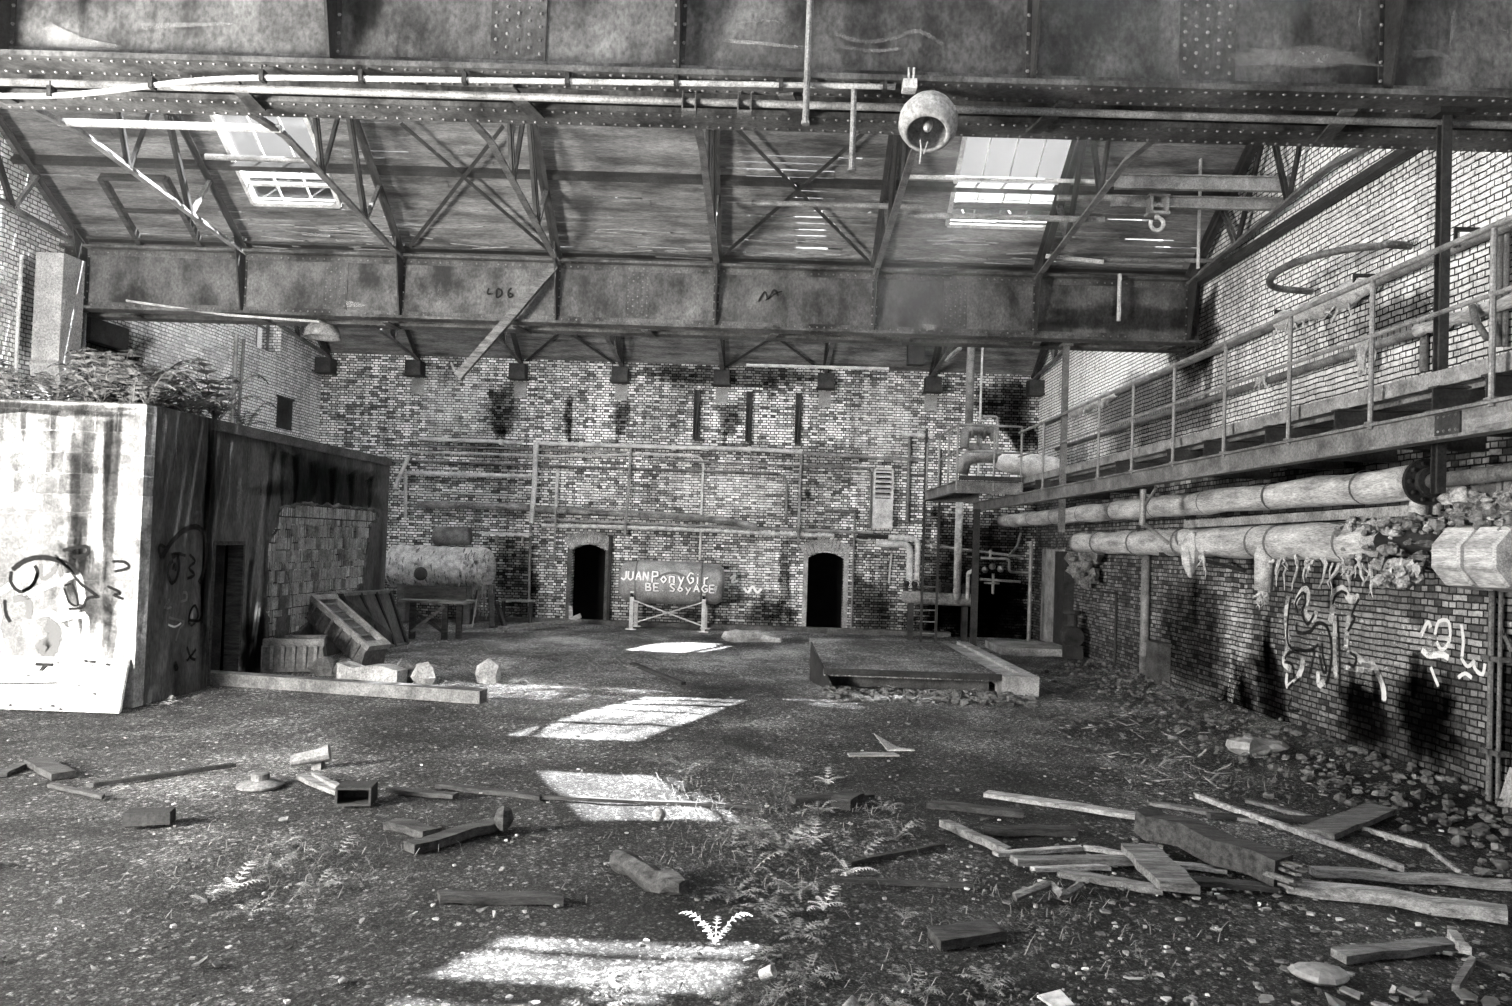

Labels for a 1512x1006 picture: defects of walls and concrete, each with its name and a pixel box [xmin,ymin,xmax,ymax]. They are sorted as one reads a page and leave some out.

damp [1323,616,1461,765]